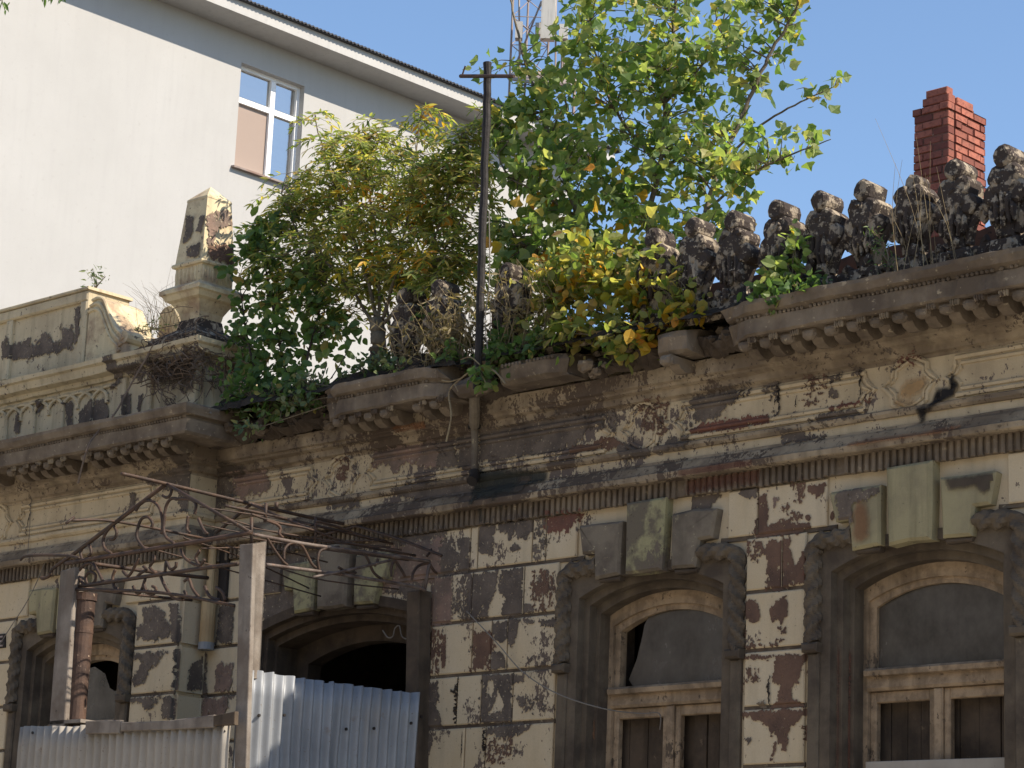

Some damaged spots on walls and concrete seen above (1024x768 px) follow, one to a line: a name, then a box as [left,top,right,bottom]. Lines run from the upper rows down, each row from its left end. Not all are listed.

peeling [183,209,235,265]
peeling [1,306,81,363]
peeling [478,368,871,465]
peeling [139,460,190,514]
peeling [214,466,272,519]
peeling [334,456,349,483]
peeling [371,438,475,501]
peeling [129,603,235,720]
peeling [263,508,585,765]
peeling [738,478,880,763]